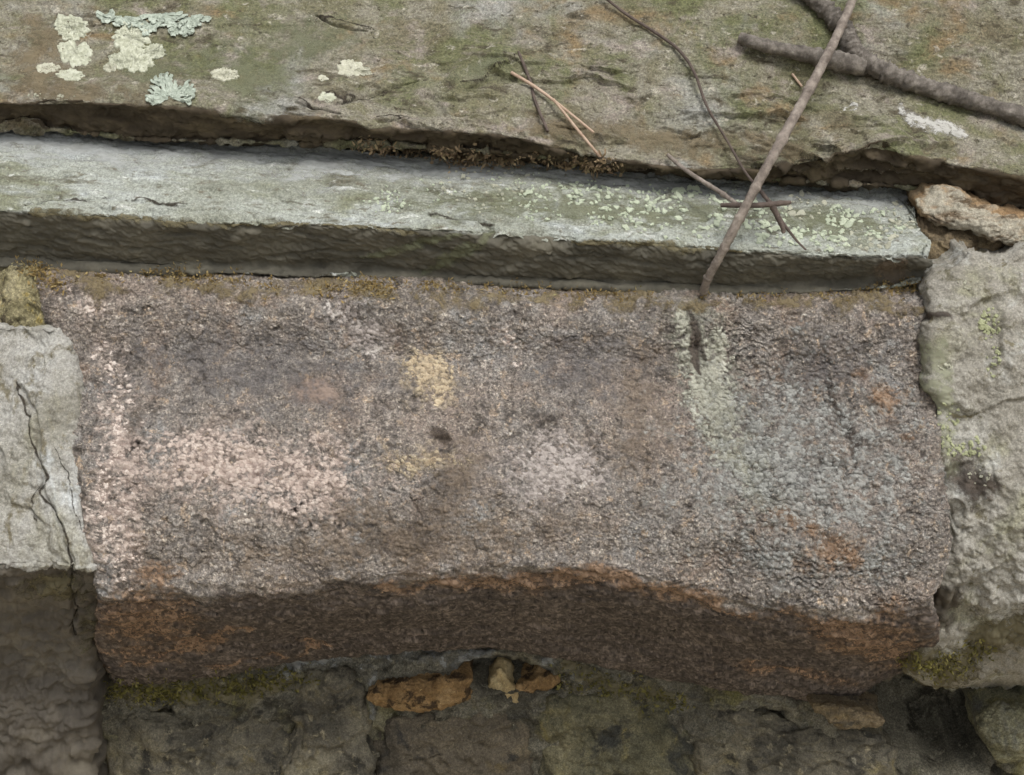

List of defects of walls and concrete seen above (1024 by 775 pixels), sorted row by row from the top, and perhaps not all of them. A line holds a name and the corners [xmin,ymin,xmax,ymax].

crack [16,381,81,635]